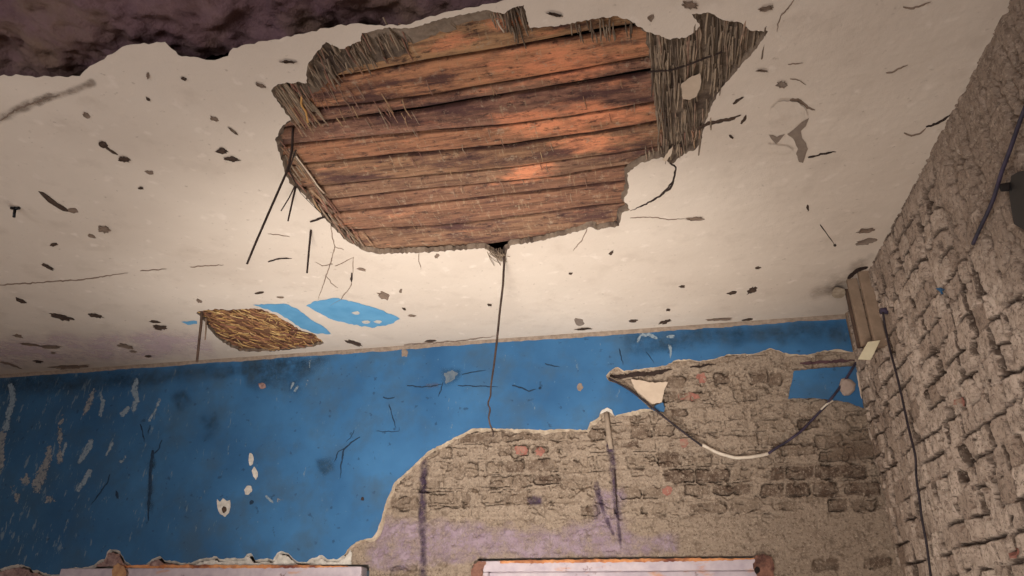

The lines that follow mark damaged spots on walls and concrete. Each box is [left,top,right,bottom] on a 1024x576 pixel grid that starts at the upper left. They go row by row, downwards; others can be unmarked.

spalling [0,0,768,266]
crack [904,115,950,137]
crack [631,162,677,220]
crack [310,217,354,304]
peeling [14,415,64,504]
crack [334,370,535,478]
flaking render [146,348,901,576]
flaking render [0,549,131,576]